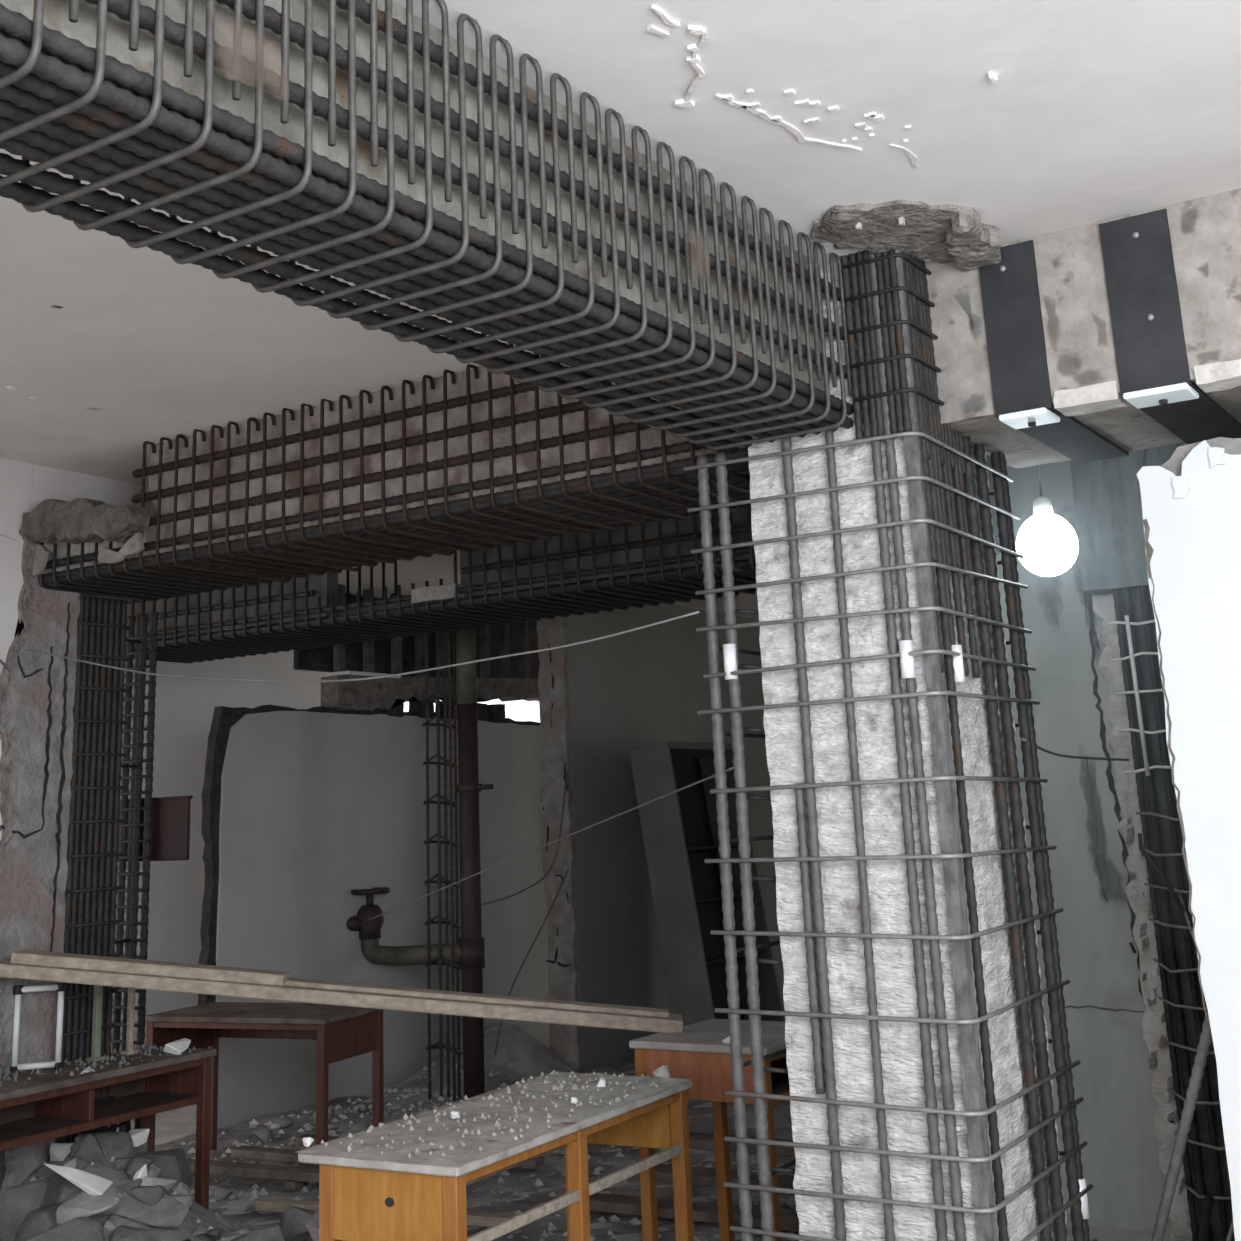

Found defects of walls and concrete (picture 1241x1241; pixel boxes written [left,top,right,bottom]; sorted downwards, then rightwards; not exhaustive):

peeling [647,4,708,108]
peeling [715,89,885,151]
peeling [889,125,918,168]
spalling [810,200,1002,272]
spalling [1172,476,1190,498]
spalling [1208,447,1225,468]
spalling [0,498,150,960]
spalling [1143,519,1207,1017]
spalling [536,616,580,1002]
spalling [0,977,59,1074]
spalling [549,1023,583,1073]
spalling [0,1139,55,1193]